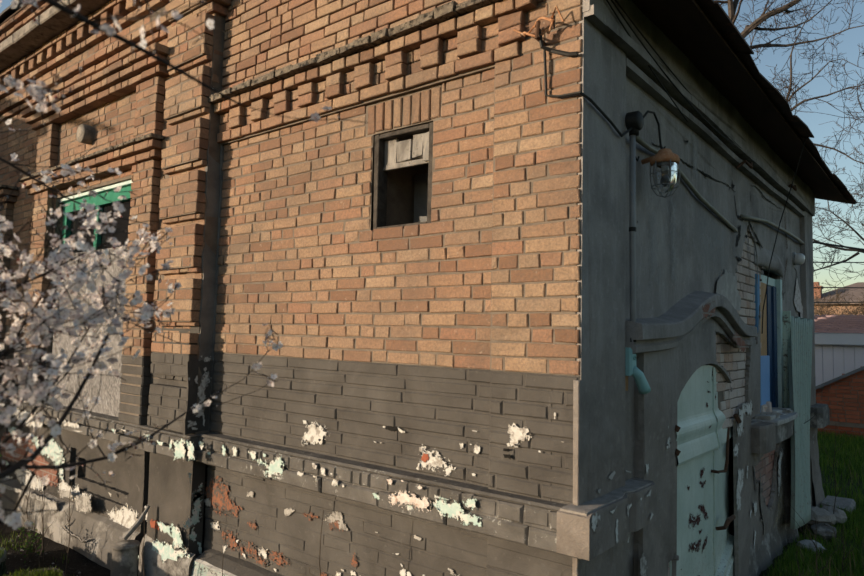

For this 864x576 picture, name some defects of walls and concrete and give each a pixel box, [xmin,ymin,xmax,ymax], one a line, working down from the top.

crack [653,140,782,284]
spalling [706,332,772,457]
spalling [0,408,92,514]
peeling [145,434,211,462]
peeling [248,451,286,479]
peeling [301,420,329,445]
peeling [297,463,344,487]
peeling [416,444,456,476]
peeling [503,423,532,459]
peeling [107,473,290,572]
peeling [284,507,348,532]
peeling [372,478,482,527]